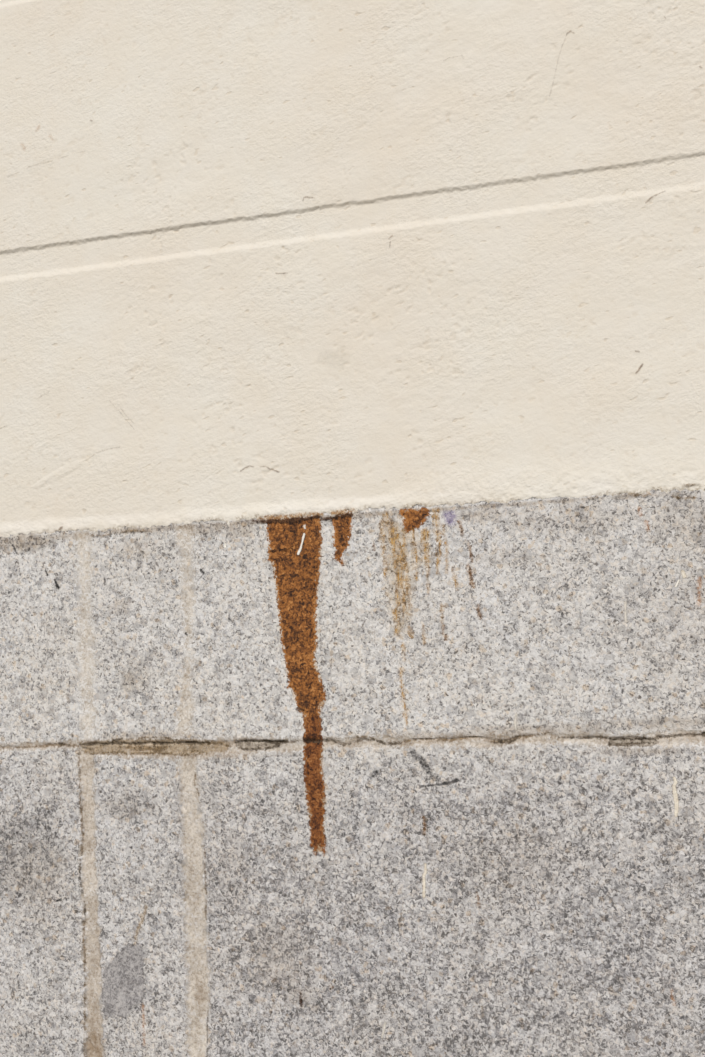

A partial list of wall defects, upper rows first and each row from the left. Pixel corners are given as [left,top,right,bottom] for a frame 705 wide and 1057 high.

crack [15,737,229,1019]
rust [252,509,353,855]
crack [287,733,611,746]